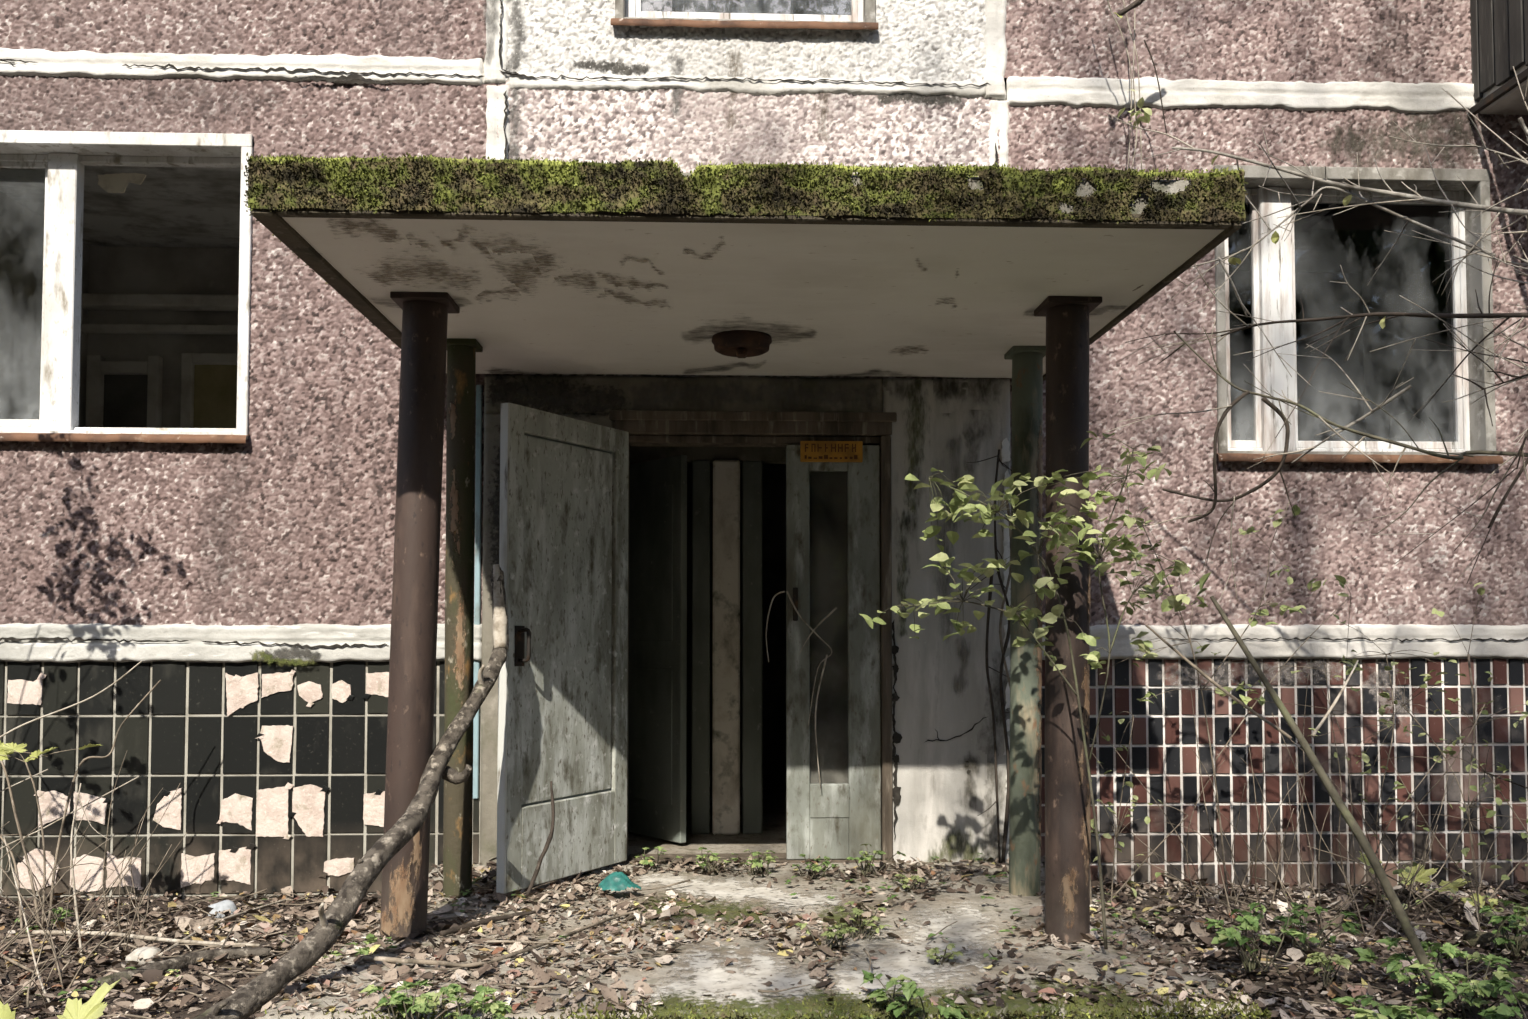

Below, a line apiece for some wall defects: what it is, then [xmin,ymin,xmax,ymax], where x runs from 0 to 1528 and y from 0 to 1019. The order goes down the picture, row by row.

rust [453,589,466,690]
spalling [7,673,47,705]
spalling [225,645,389,717]
spalling [34,790,111,827]
spalling [153,788,182,830]
spalling [180,783,330,888]
spalling [256,725,293,763]
spalling [363,788,385,827]
leakage [965,674,1007,860]
rust [1060,663,1091,928]
spalling [14,849,143,895]
rust [380,832,422,937]